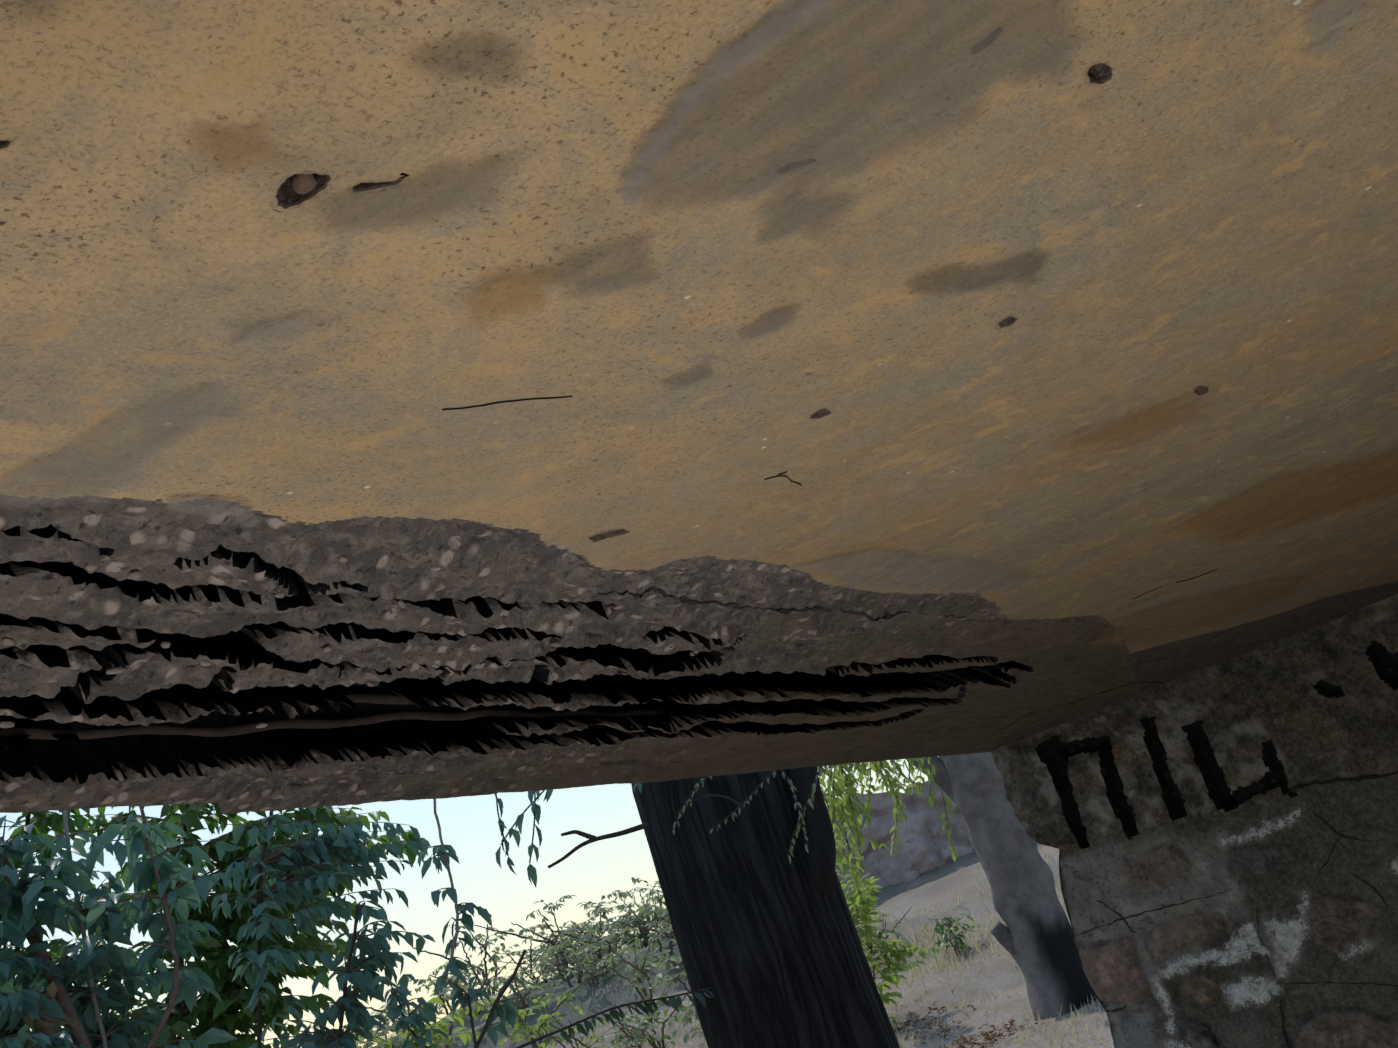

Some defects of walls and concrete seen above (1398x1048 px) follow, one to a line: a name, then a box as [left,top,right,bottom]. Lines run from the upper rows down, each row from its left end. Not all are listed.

spalling [270,168,410,213]
spalling [0,495,1398,854]
flaking render [1225,841,1296,882]